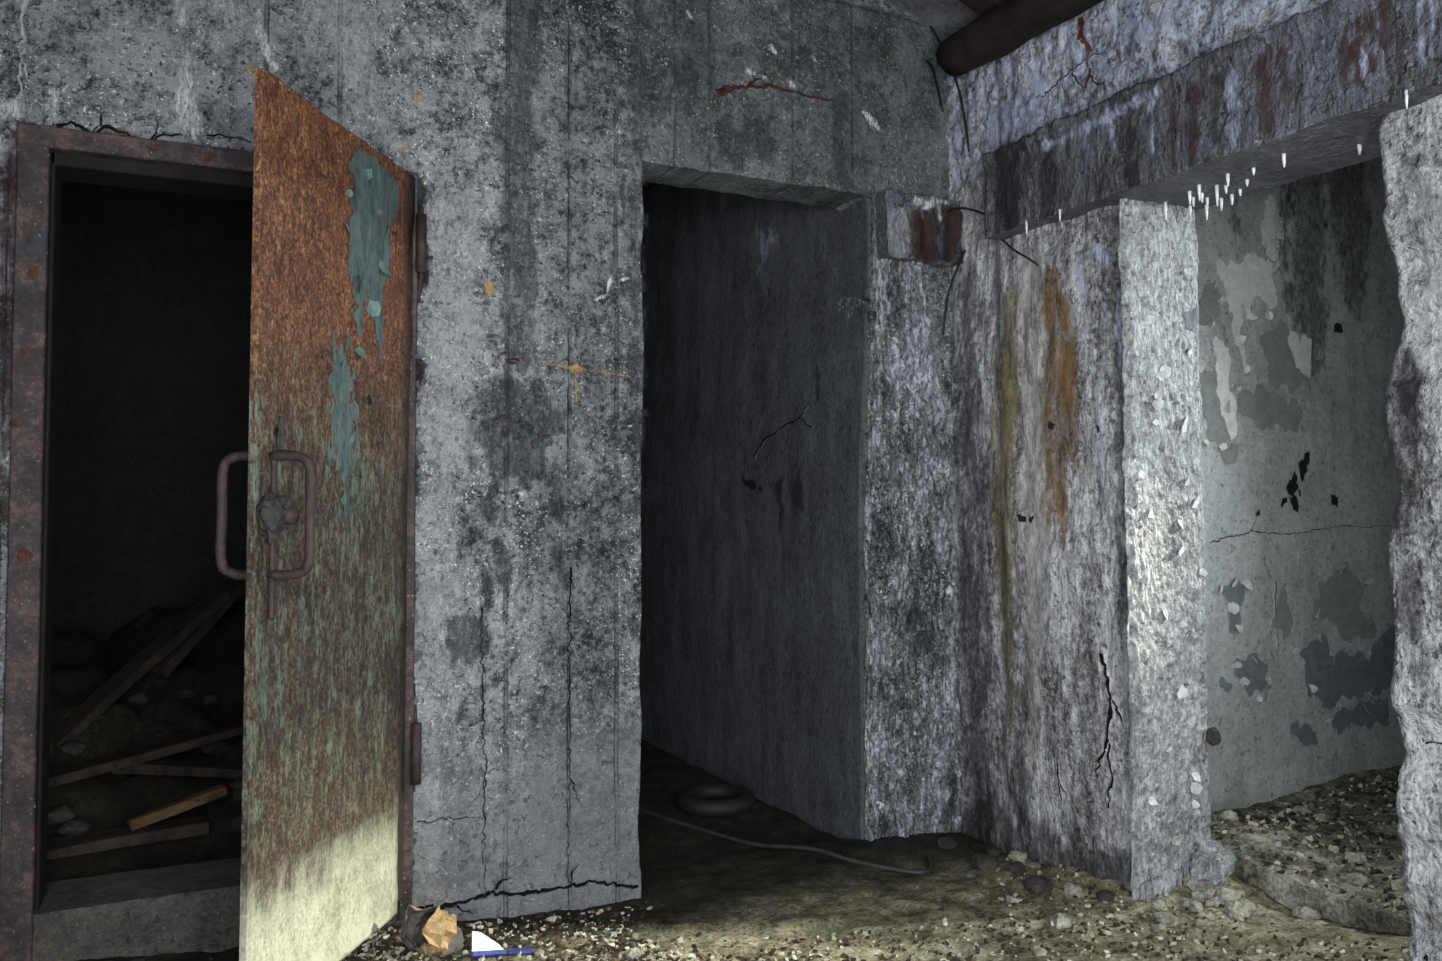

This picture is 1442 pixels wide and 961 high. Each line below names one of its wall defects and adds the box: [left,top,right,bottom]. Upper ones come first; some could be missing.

corrosion [0,118,38,523]
peeling [350,275,381,317]
peeling [355,339,378,359]
corrosion [904,203,963,261]
corrosion [1040,270,1077,542]
crack [412,567,639,914]
crack [1057,653,1125,809]
spalling [1118,193,1312,901]
crack [1210,507,1392,664]
peeling [1273,567,1395,746]